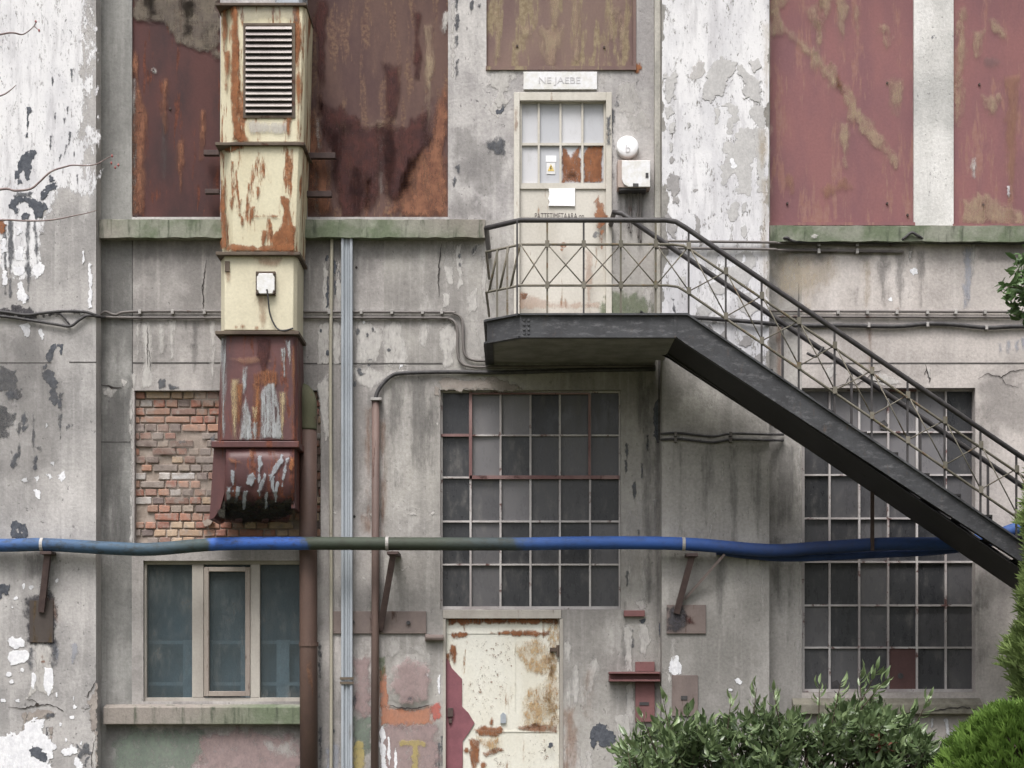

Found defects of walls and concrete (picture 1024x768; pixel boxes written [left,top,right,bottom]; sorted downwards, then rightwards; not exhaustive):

corrosion [132,53,147,214]
corrosion [221,0,448,217]
corrosion [562,115,611,183]
peeling [0,150,57,304]
corrosion [220,181,296,252]
corrosion [593,197,608,249]
peeling [663,56,767,338]
peeling [19,323,63,408]
spalling [10,520,28,539]
peeling [6,636,29,684]
peeling [0,683,98,768]
corrosion [446,619,559,768]